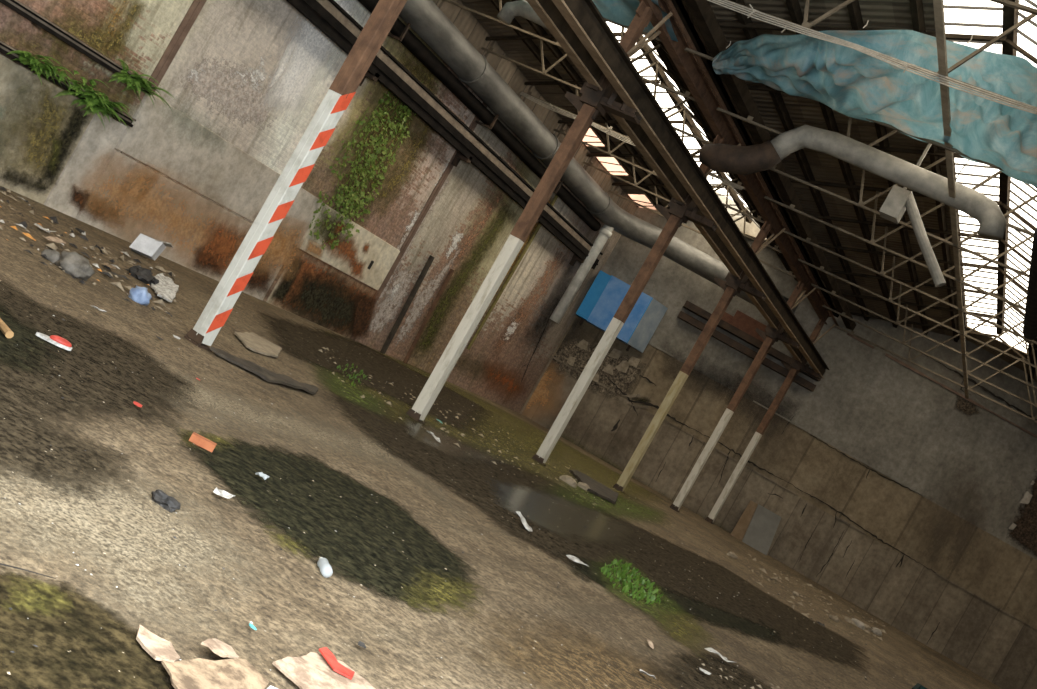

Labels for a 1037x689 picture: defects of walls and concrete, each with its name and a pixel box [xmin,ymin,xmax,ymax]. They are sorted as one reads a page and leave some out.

damp [52,0,143,57]
damp [0,172,48,191]
damp [71,186,122,224]
rust [92,173,244,269]
damp [195,251,221,275]
damp [247,258,374,336]
peeling [369,158,463,346]
damp [479,222,539,323]
spalling [554,338,650,408]
damp [0,279,478,612]
crack [605,375,936,579]